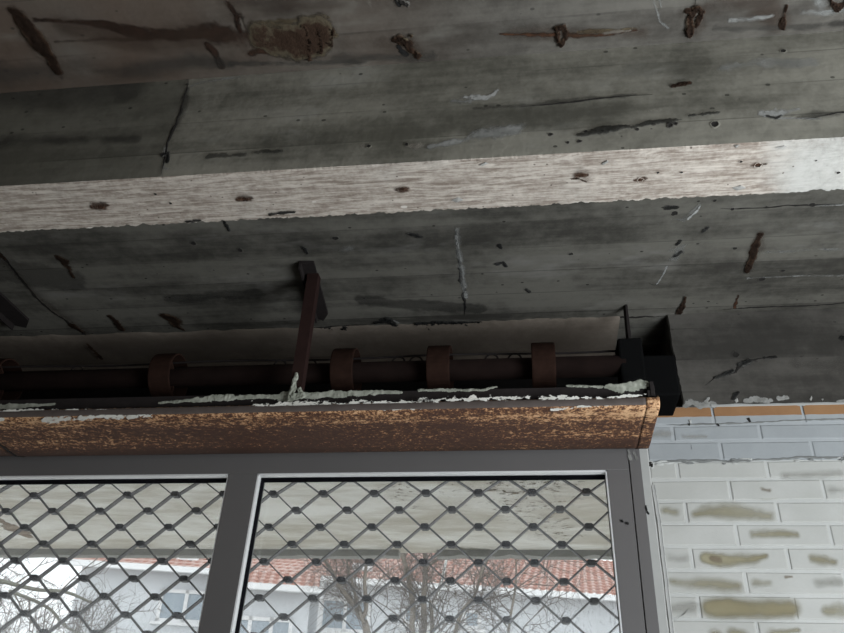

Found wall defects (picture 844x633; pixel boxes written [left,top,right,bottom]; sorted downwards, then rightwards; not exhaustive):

spalling [226,2,339,62]
crack [160,77,237,174]
crack [705,355,777,386]